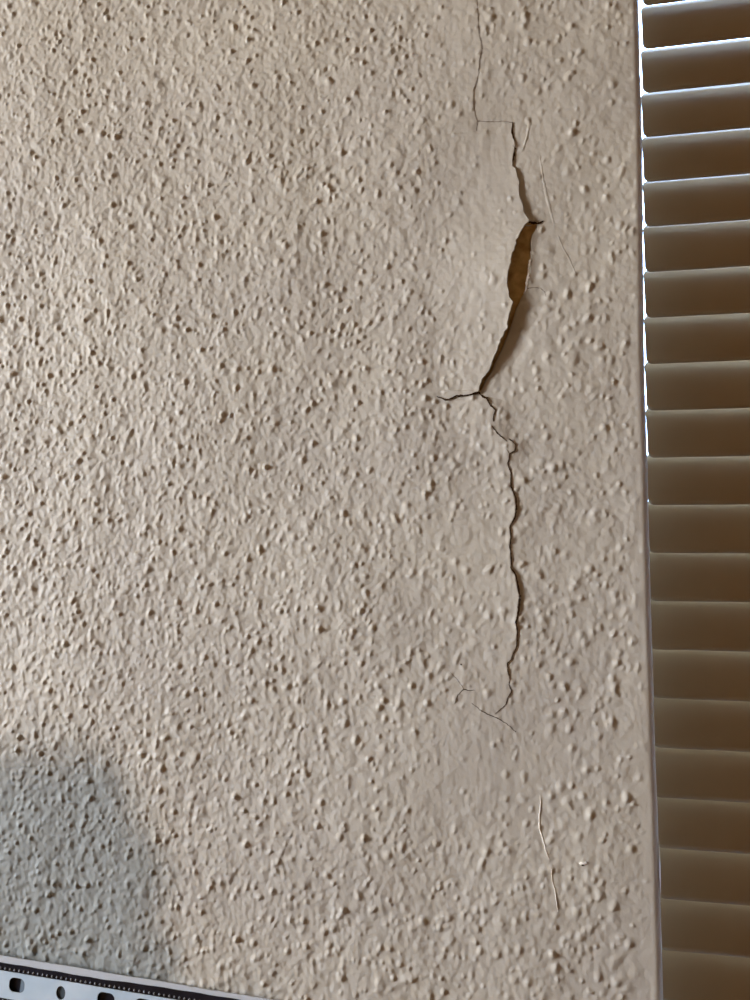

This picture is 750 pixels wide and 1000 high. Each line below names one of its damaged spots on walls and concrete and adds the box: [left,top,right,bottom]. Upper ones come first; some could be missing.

crack [473,2,516,161]
crack [437,391,521,732]